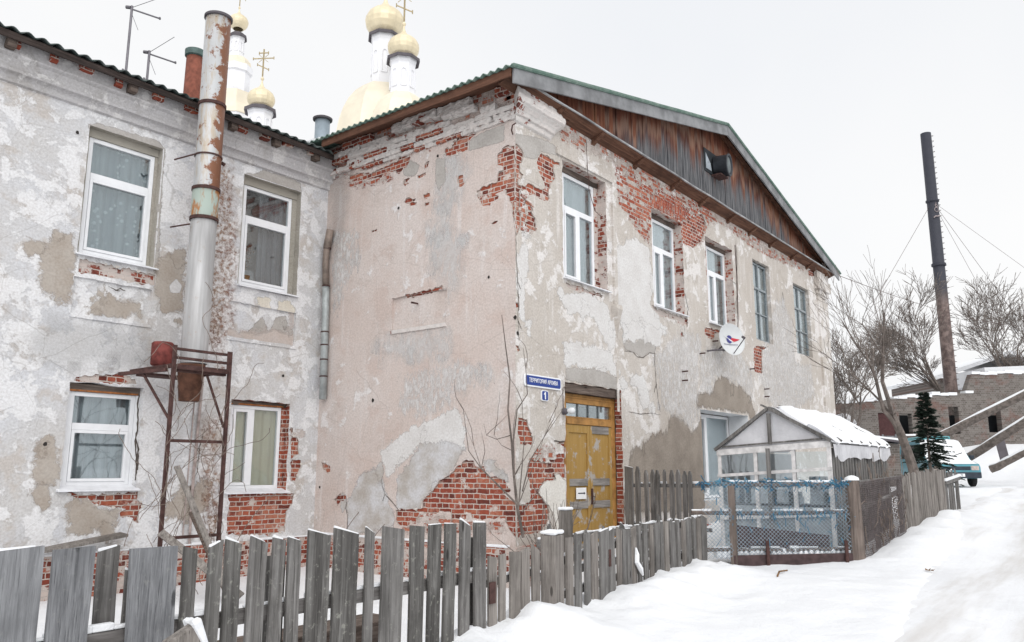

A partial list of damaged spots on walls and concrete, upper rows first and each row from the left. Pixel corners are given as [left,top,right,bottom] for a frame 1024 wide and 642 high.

flaking render [335,89,514,209]
flaking render [23,229,187,325]
rust [210,168,236,343]
flaking render [227,312,294,346]
flaking render [475,144,559,352]
flaking render [557,127,814,516]
flaking render [64,492,144,544]
flaking render [226,428,305,536]
flaking render [335,408,566,537]